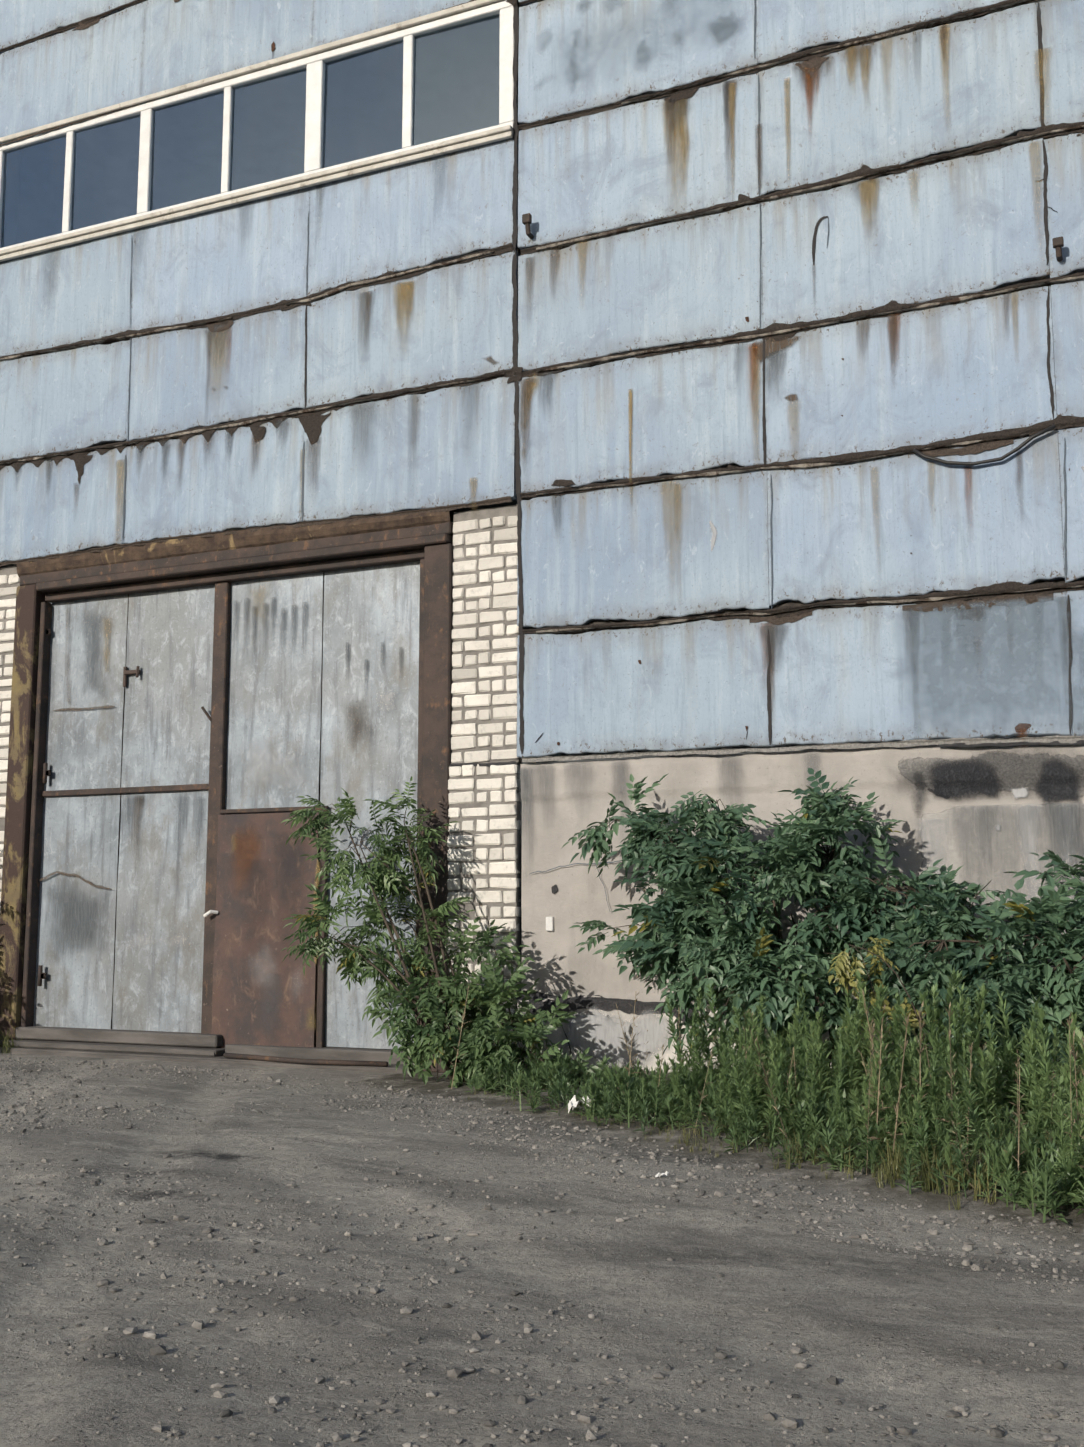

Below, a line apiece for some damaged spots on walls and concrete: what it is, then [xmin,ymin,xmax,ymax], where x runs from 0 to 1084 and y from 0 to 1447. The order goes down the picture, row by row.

rust [848,46,868,76]
rust [940,25,948,60]
rust [666,100,685,162]
rust [725,80,735,142]
rust [785,59,828,128]
rust [749,346,781,405]
damp [916,761,999,810]